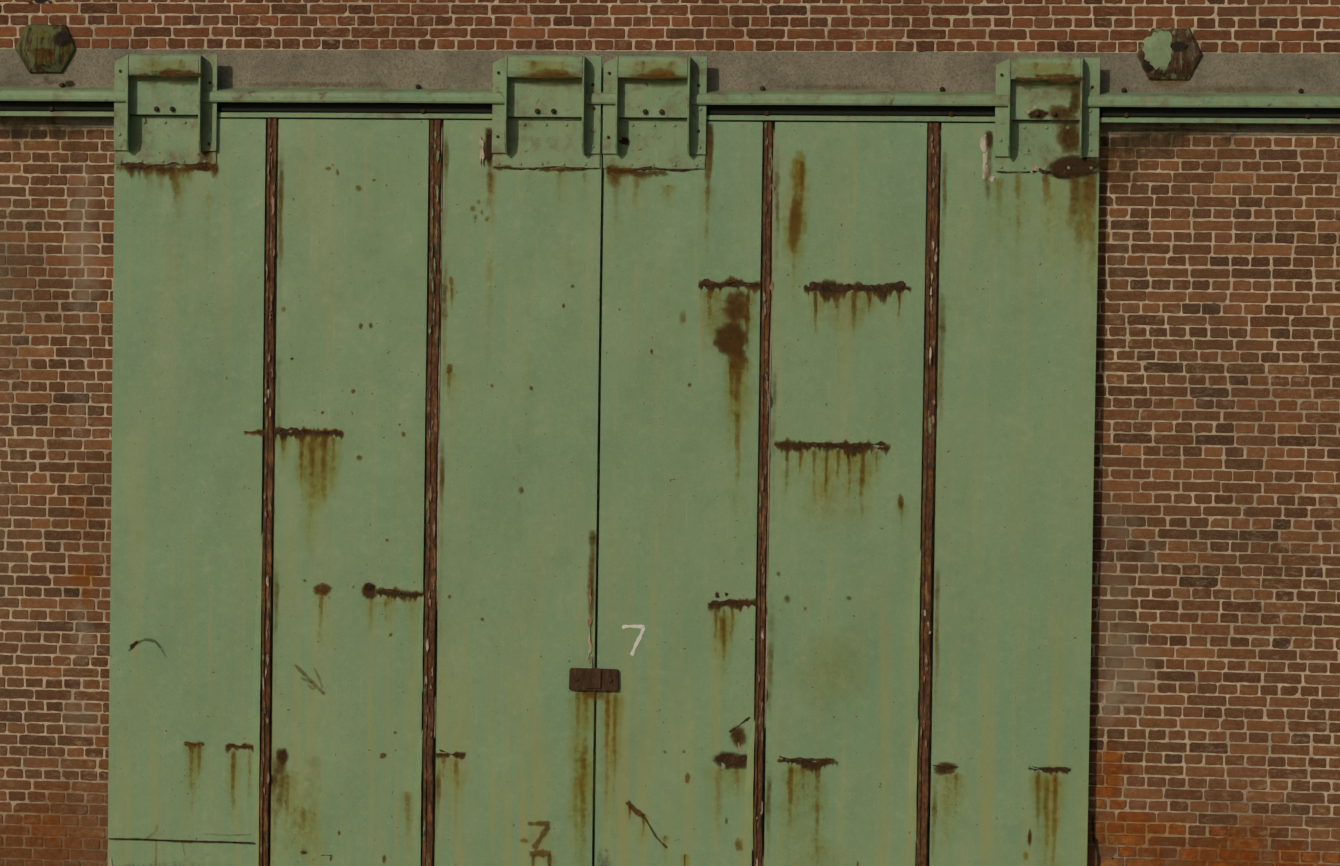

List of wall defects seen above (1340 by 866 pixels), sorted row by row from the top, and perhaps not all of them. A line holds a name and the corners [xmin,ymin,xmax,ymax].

rust [996,75,1099,188]
rust [120,153,217,173]
peeling [980,133,995,182]
rust [790,204,800,236]
rust [804,281,911,308]
rust [699,278,761,381]
rust [245,427,343,448]
rust [775,440,889,473]
rust [363,583,424,599]
rust [709,591,757,611]
rust [778,756,834,771]
rust [1029,766,1071,774]